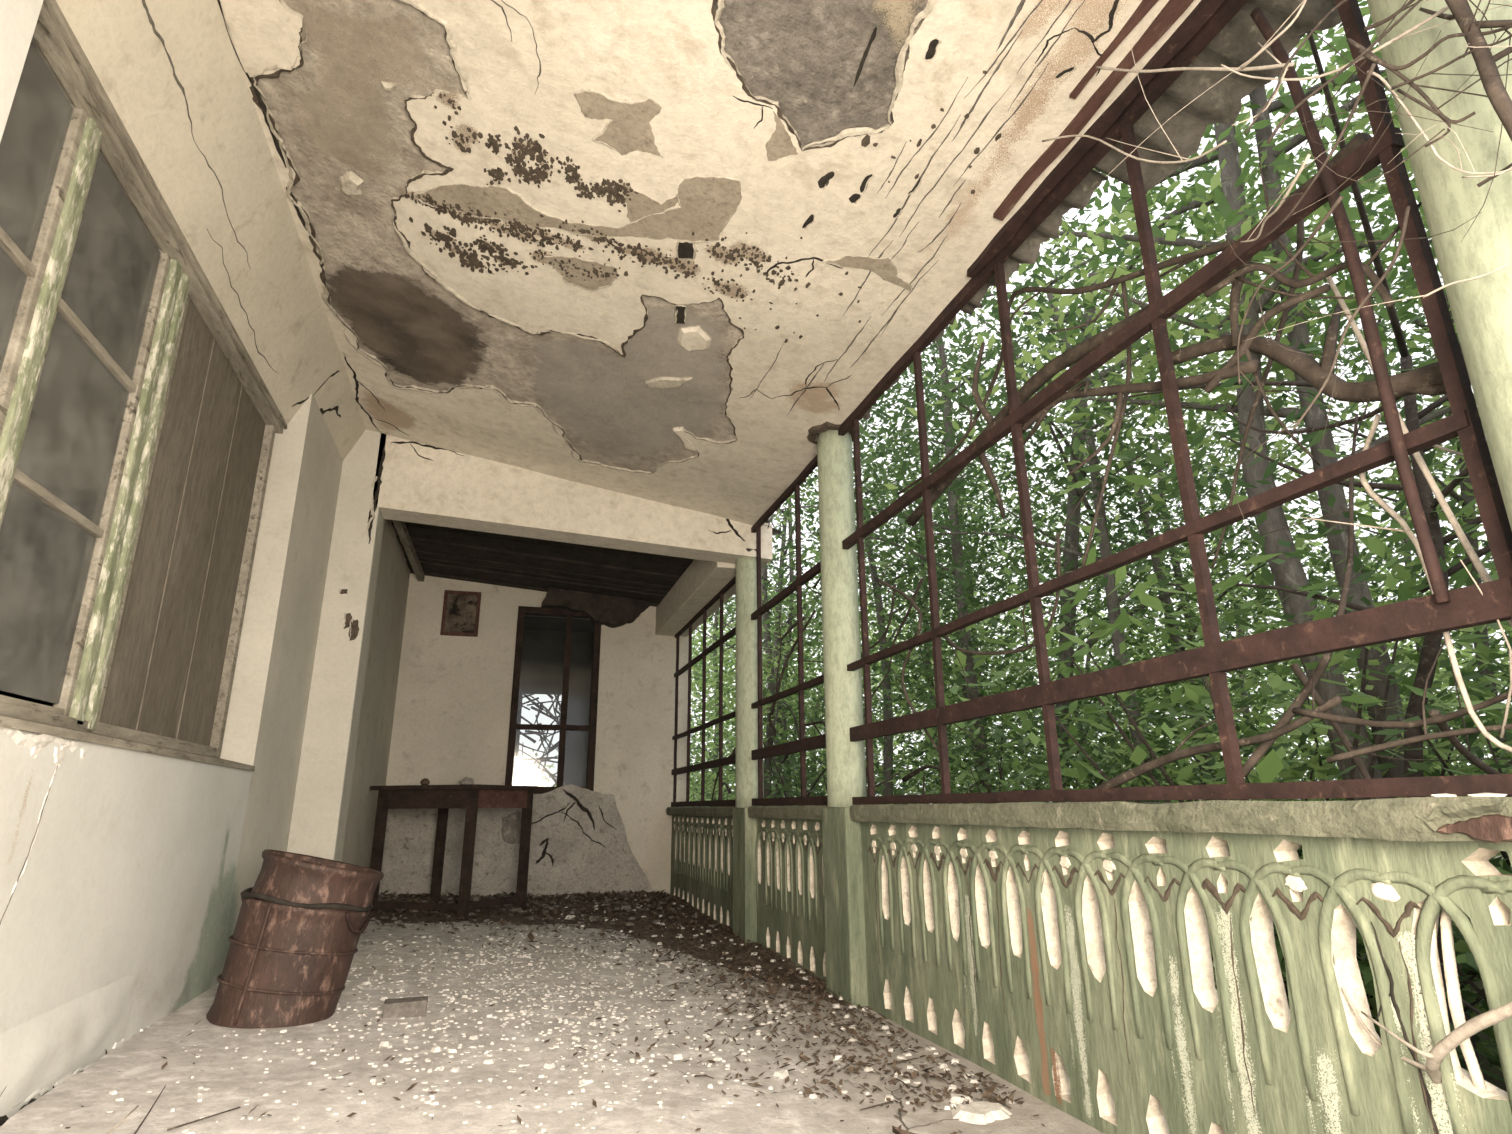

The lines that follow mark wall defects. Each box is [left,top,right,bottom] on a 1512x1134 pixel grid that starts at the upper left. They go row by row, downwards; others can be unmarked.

peeling [711,0,942,161]
crack [142,0,464,544]
leakage [325,262,491,387]
peeling [250,0,811,474]
crack [733,0,1119,416]
crack [0,765,59,925]
crack [0,1025,149,1126]
crack [1371,922,1439,1134]